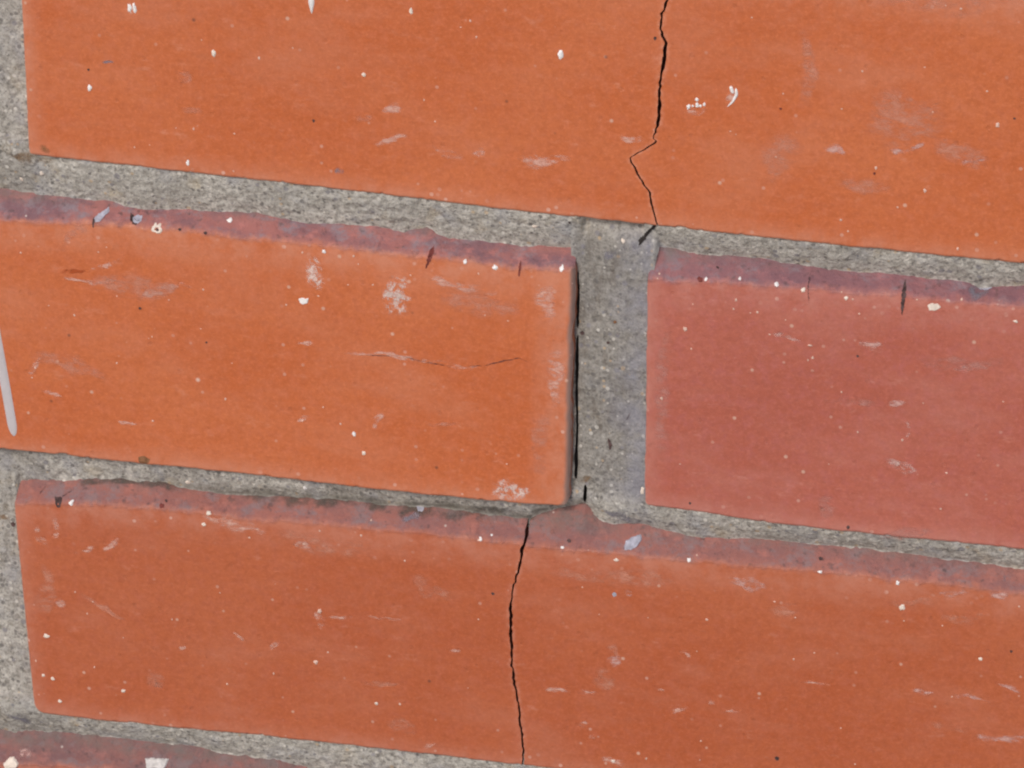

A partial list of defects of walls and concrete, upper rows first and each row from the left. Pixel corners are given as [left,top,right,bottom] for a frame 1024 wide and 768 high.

crack [630,0,668,245]
crack [509,518,531,764]